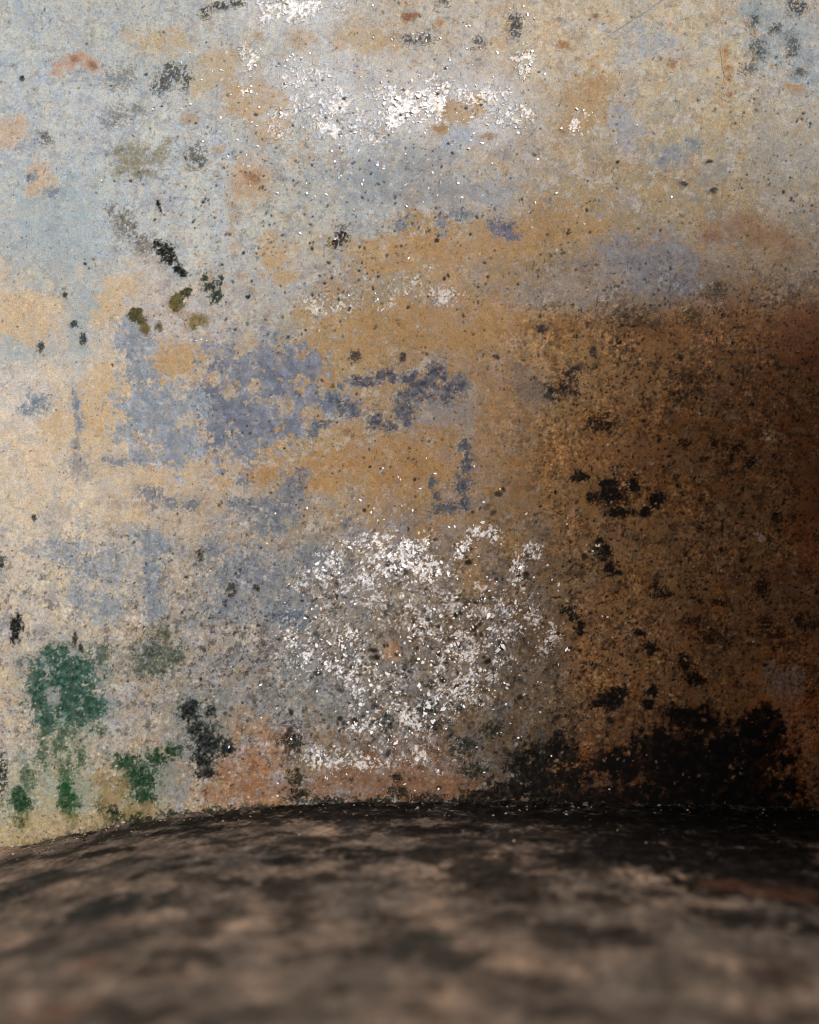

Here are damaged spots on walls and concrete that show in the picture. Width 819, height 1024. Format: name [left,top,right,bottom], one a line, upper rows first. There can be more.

damp [97,0,639,196]
mould [578,407,626,438]
corrosion [518,427,744,479]
damp [0,430,819,1024]